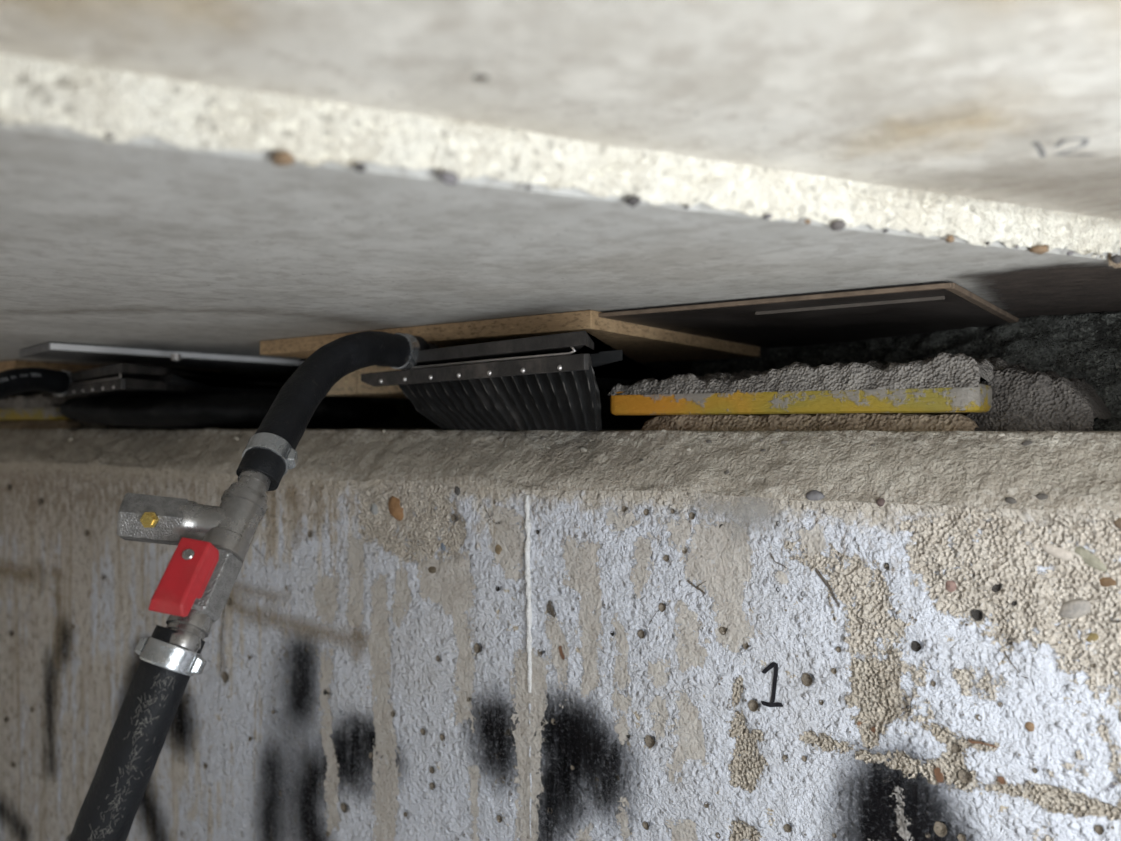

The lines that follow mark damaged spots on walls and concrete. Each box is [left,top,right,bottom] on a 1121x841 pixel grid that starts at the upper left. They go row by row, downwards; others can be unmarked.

spalling [311,481,481,841]
peeling [491,506,539,591]
peeling [509,503,761,841]
spalling [725,675,769,793]
flaking render [806,490,825,501]
spalling [775,506,1121,841]